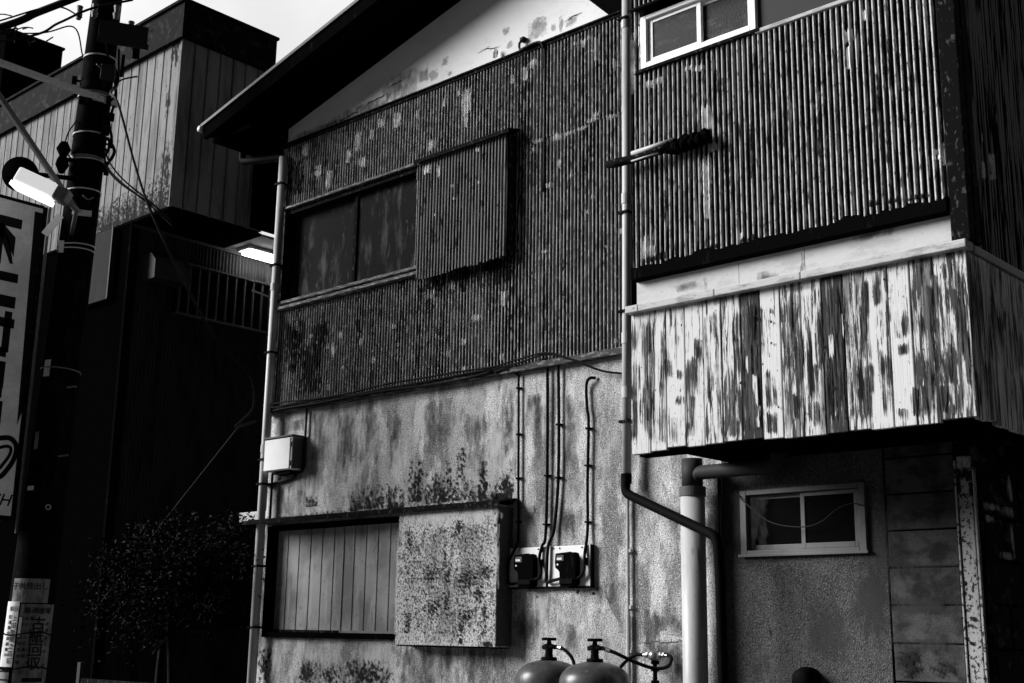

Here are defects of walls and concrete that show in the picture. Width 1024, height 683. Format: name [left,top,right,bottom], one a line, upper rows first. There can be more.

peeling [530,16,576,38]
peeling [574,36,598,61]
peeling [419,59,451,82]
peeling [511,58,537,84]
peeling [630,257,1024,442]
water stain [283,389,546,641]
water stain [257,649,280,683]
water stain [295,645,408,683]